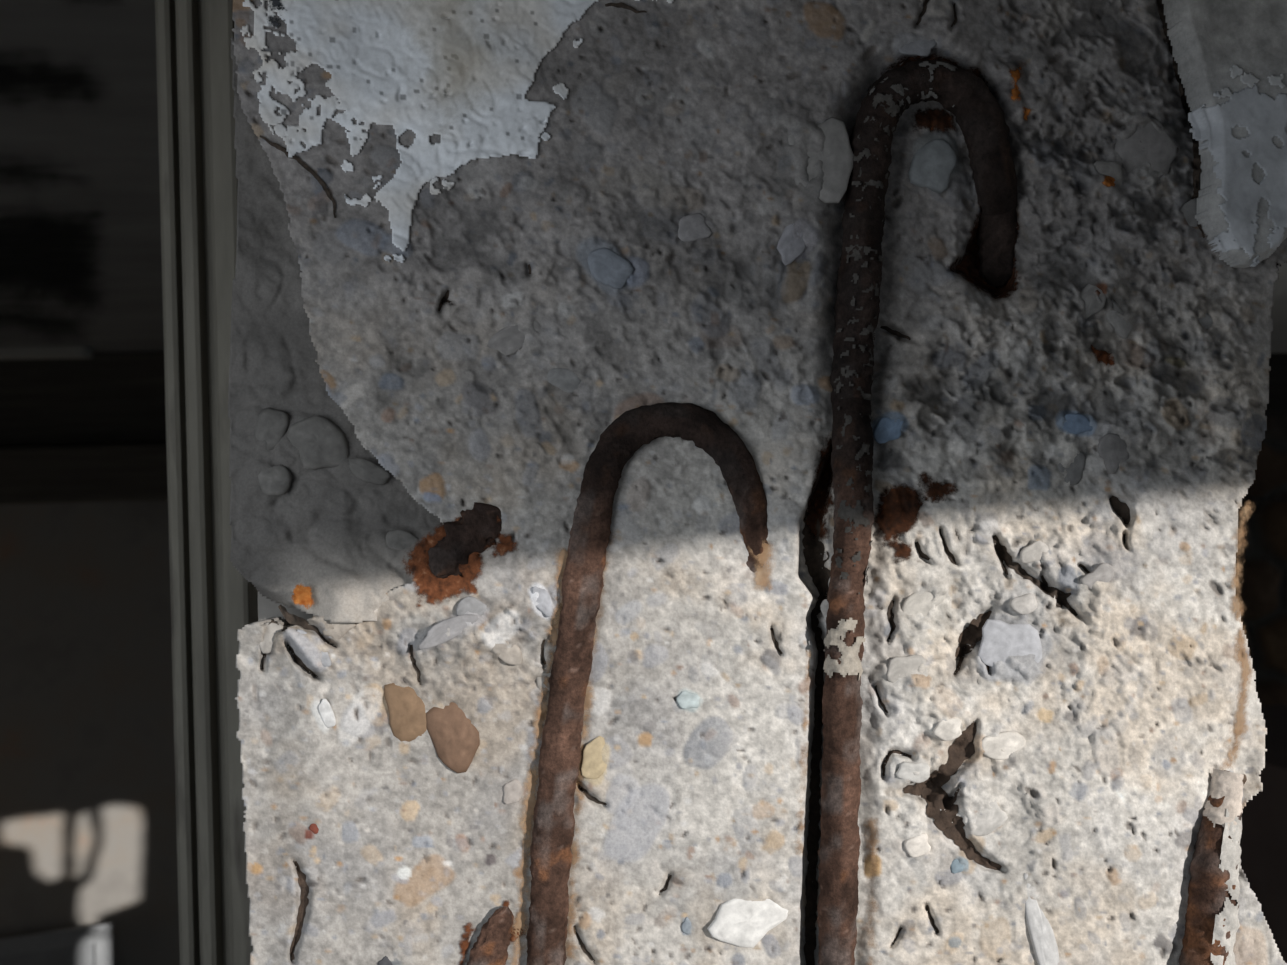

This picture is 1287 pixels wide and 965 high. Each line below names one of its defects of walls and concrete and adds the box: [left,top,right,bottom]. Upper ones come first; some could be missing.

peeling [240,0,599,252]
rust [948,205,1020,299]
flaking render [1162,0,1287,111]
peeling [1188,65,1287,269]
rust [403,517,517,607]
rust [804,437,834,539]
spalling [812,60,1018,965]
rust [874,473,958,563]
rust [502,548,568,965]
spalling [517,402,768,965]
rust [459,923,476,965]
spalling [1179,768,1287,965]